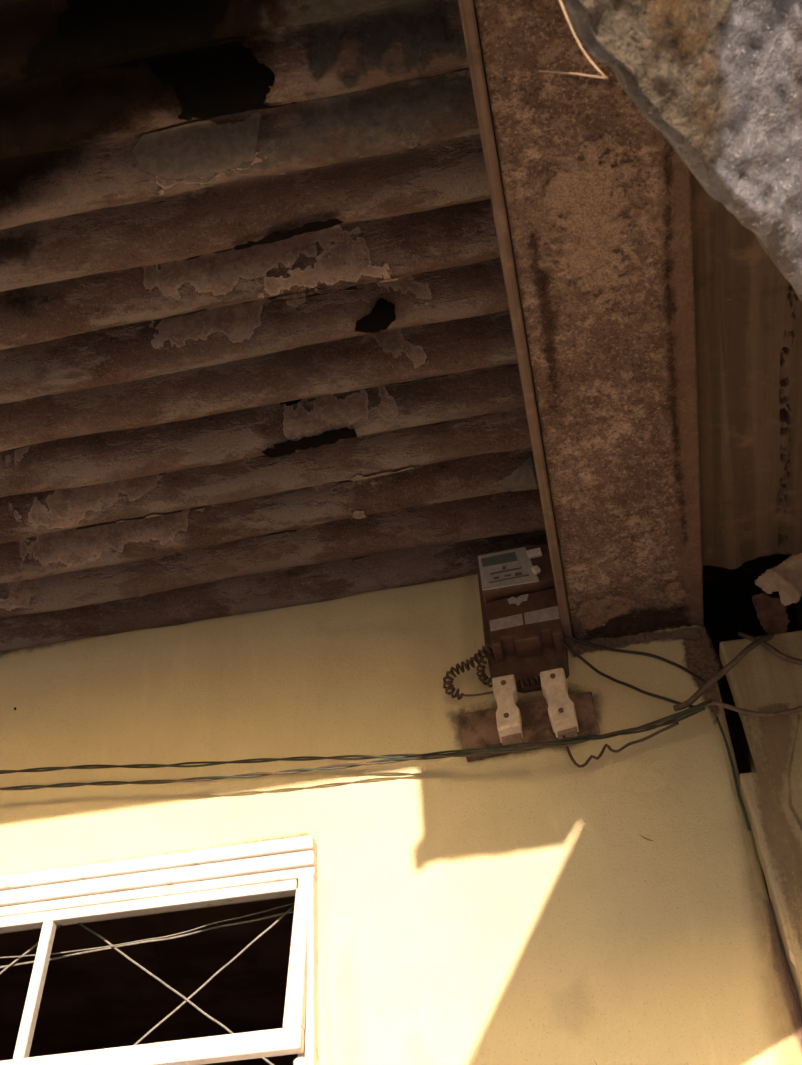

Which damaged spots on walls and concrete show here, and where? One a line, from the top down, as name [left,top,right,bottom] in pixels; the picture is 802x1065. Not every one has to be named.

peeling [132,0,472,195]
peeling [141,224,432,357]
peeling [283,328,453,452]
peeling [9,472,206,568]
peeling [0,578,39,611]